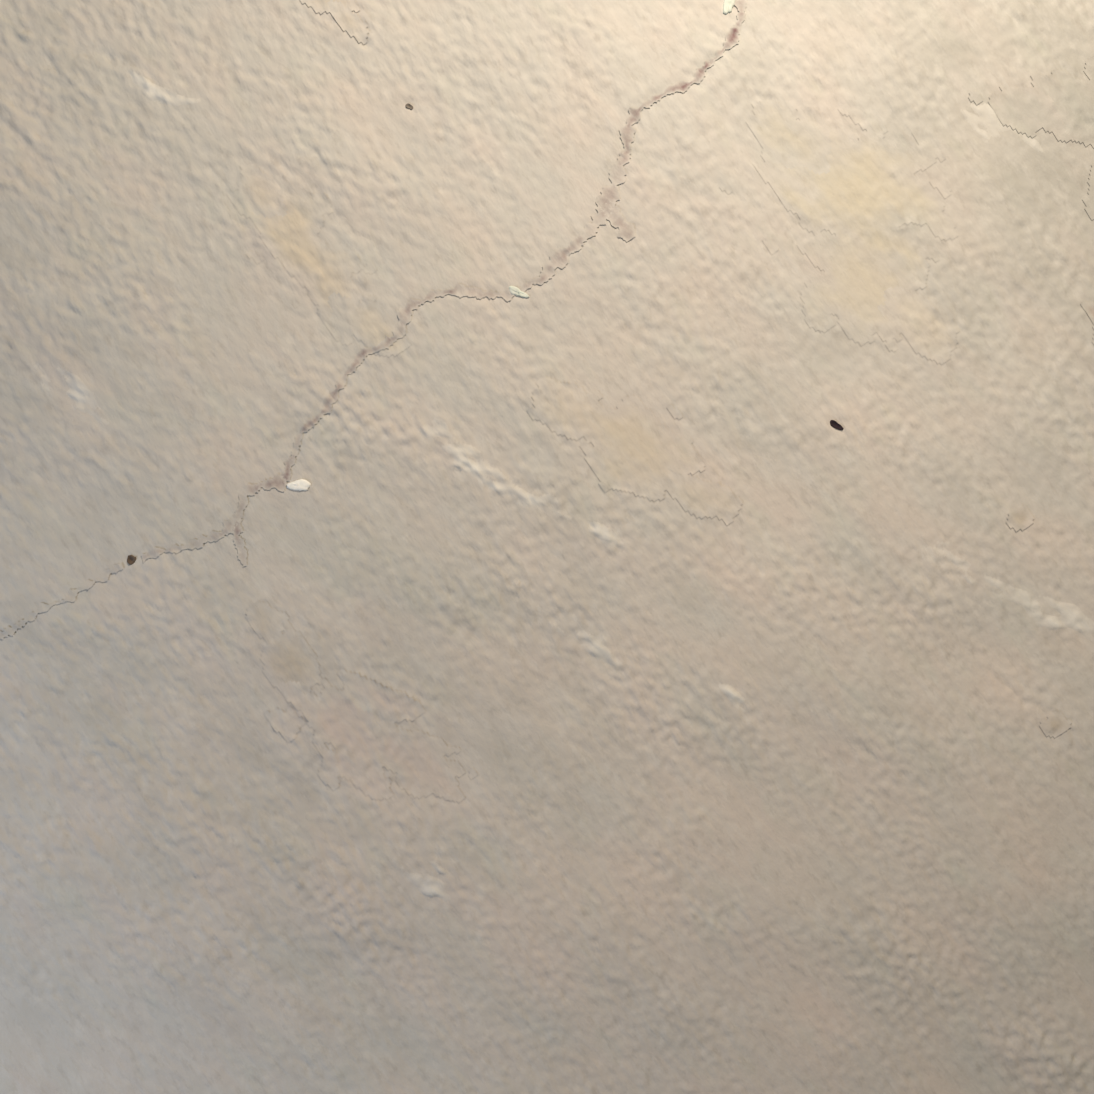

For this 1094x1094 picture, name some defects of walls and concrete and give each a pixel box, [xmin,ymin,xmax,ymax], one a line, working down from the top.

crack [141,0,747,567]